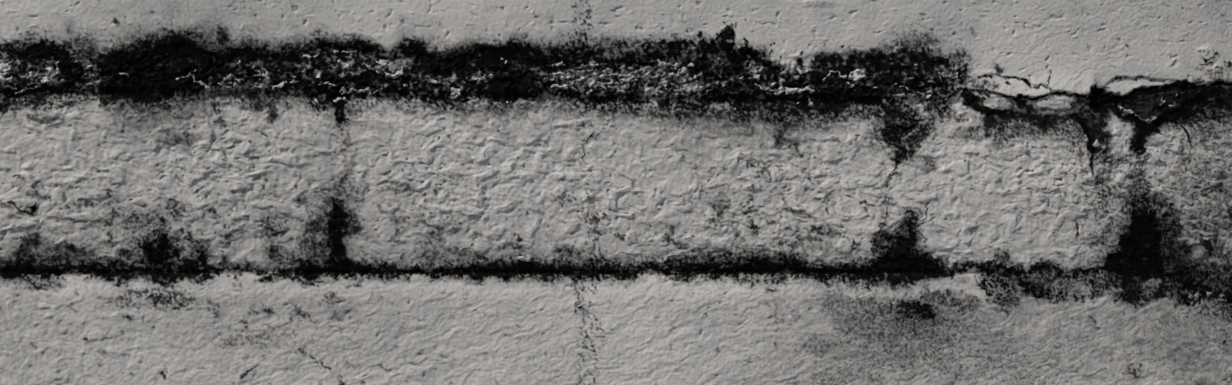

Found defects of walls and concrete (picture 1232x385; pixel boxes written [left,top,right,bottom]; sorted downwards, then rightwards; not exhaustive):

water stain [0,0,1127,203]
crack [956,69,1232,101]
water stain [1157,61,1232,134]
water stain [0,119,1232,383]